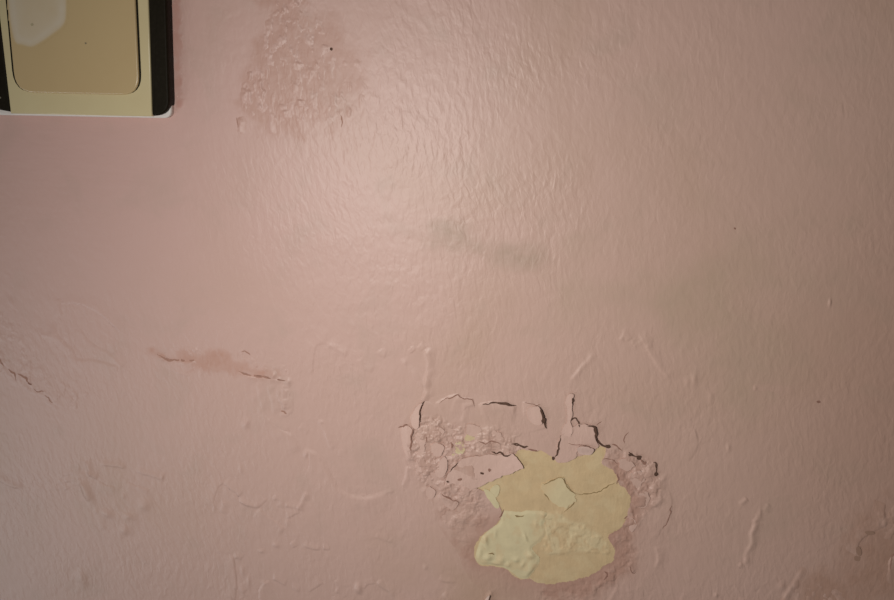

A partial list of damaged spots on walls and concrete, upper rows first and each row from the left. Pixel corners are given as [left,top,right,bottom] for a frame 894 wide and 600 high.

damp [229,0,377,149]
crack [144,343,295,433]
peeling [394,387,678,600]